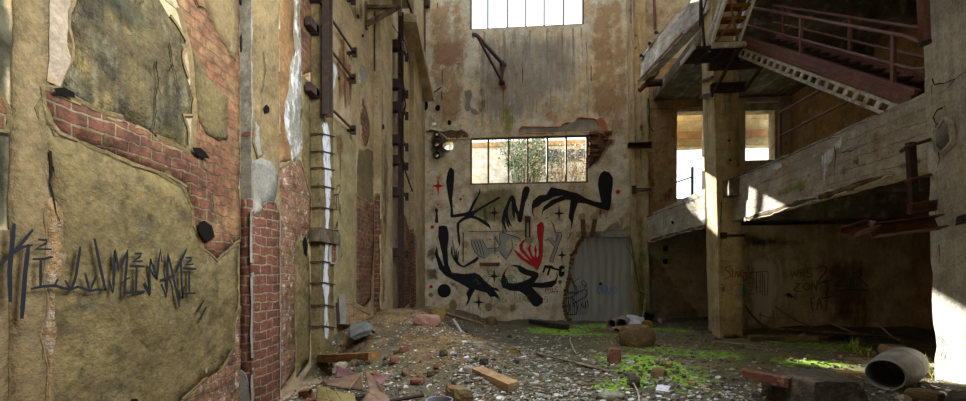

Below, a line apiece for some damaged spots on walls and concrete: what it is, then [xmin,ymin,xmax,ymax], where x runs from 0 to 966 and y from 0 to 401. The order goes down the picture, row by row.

crack [49,151,61,223]
peeling [34,0,312,401]
flaking render [355,62,386,315]
spalling [562,238,584,321]